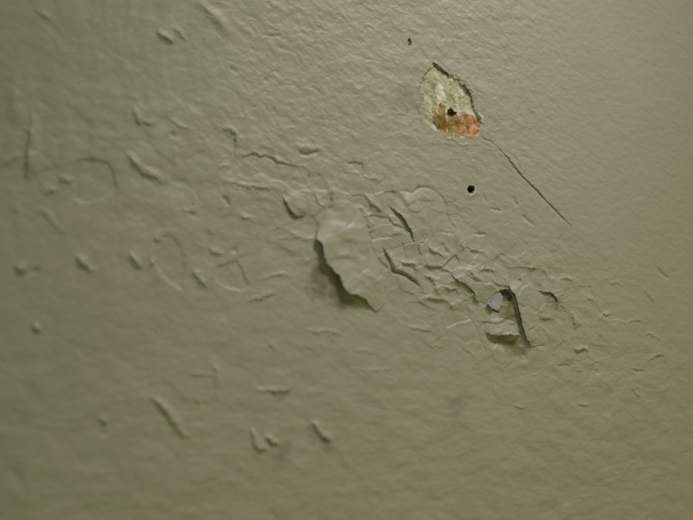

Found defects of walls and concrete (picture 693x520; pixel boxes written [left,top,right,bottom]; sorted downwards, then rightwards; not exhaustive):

spalling [412,62,484,151]
crack [479,135,572,227]
crack [382,247,421,286]
peeling [316,161,584,361]